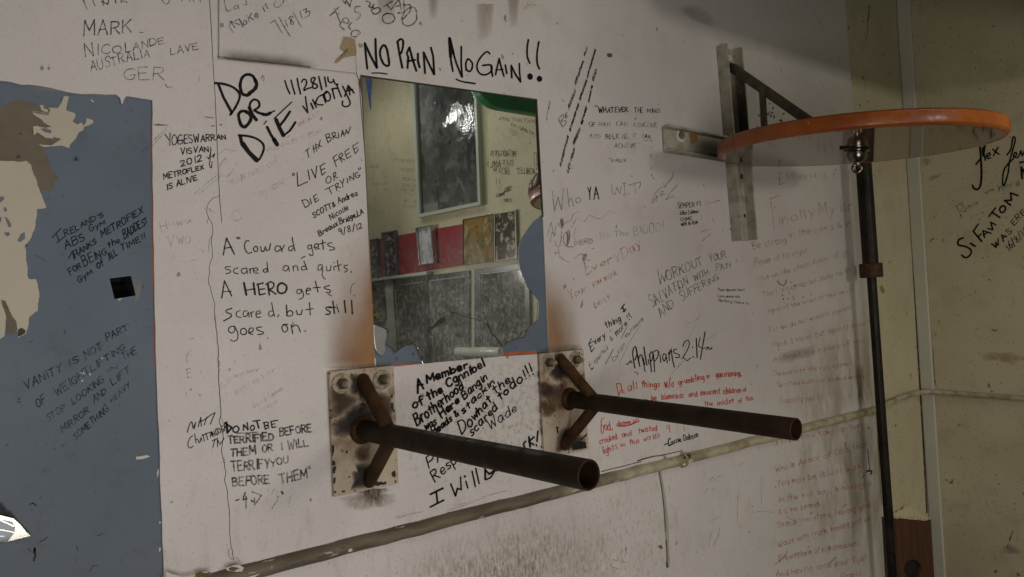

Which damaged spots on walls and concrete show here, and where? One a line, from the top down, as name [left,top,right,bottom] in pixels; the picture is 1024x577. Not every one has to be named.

rust [341,275,375,368]